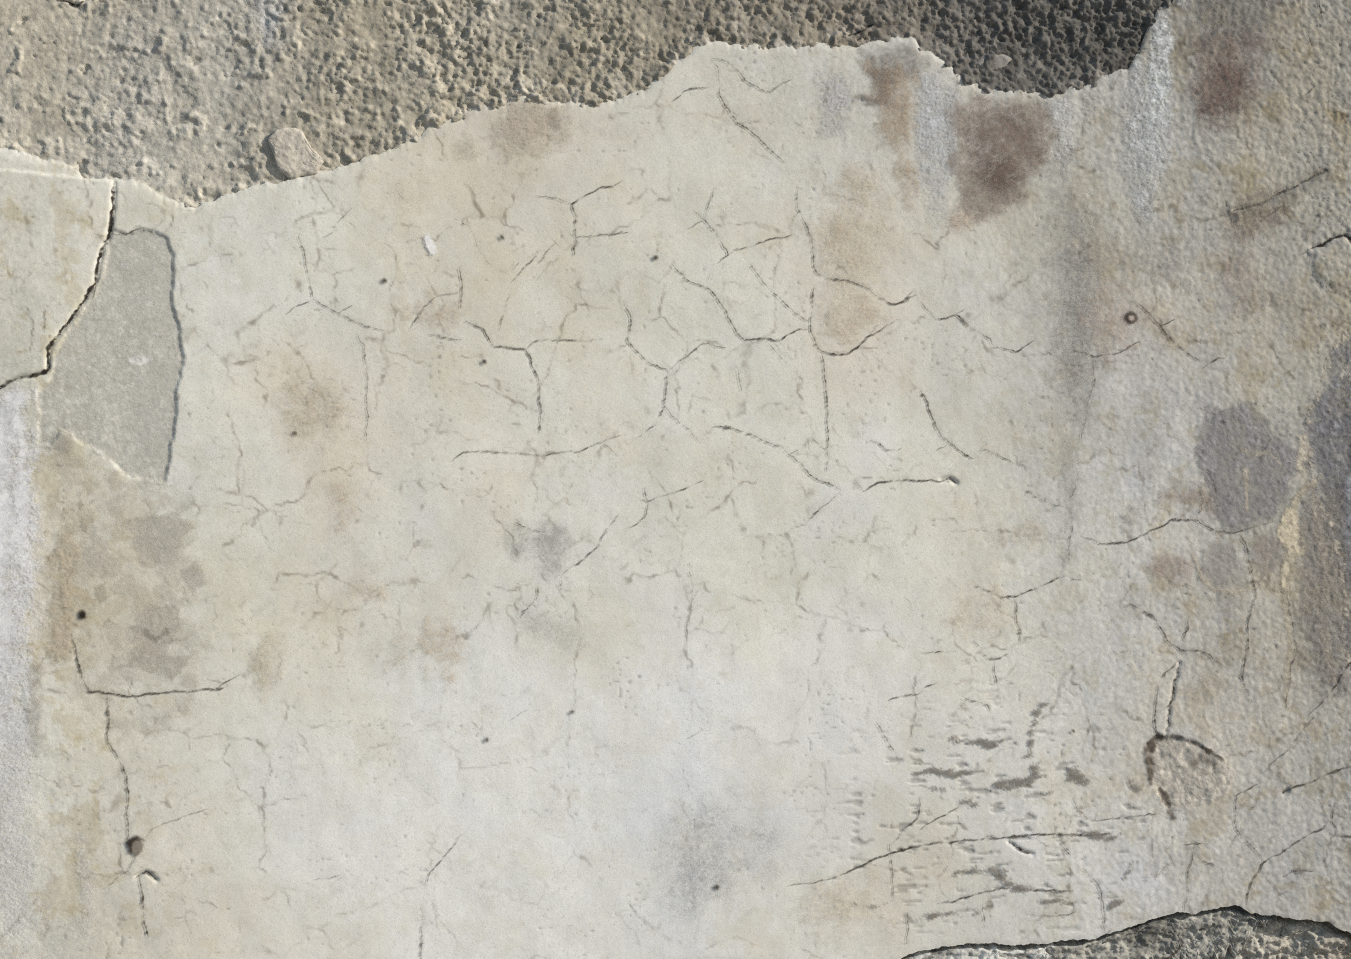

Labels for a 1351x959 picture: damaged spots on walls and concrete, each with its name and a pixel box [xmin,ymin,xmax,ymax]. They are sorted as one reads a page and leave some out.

peeling [0,0,1173,208]
damp [867,47,958,208]
crack [0,187,134,390]
peeling [35,226,181,503]
crack [626,194,1033,518]
damp [0,383,46,947]
crack [71,640,231,840]
crack [800,800,1154,944]
spalling [901,905,1351,959]
crack [967,469,1351,732]
spalling [1145,735,1234,819]
damp [1295,335,1351,693]